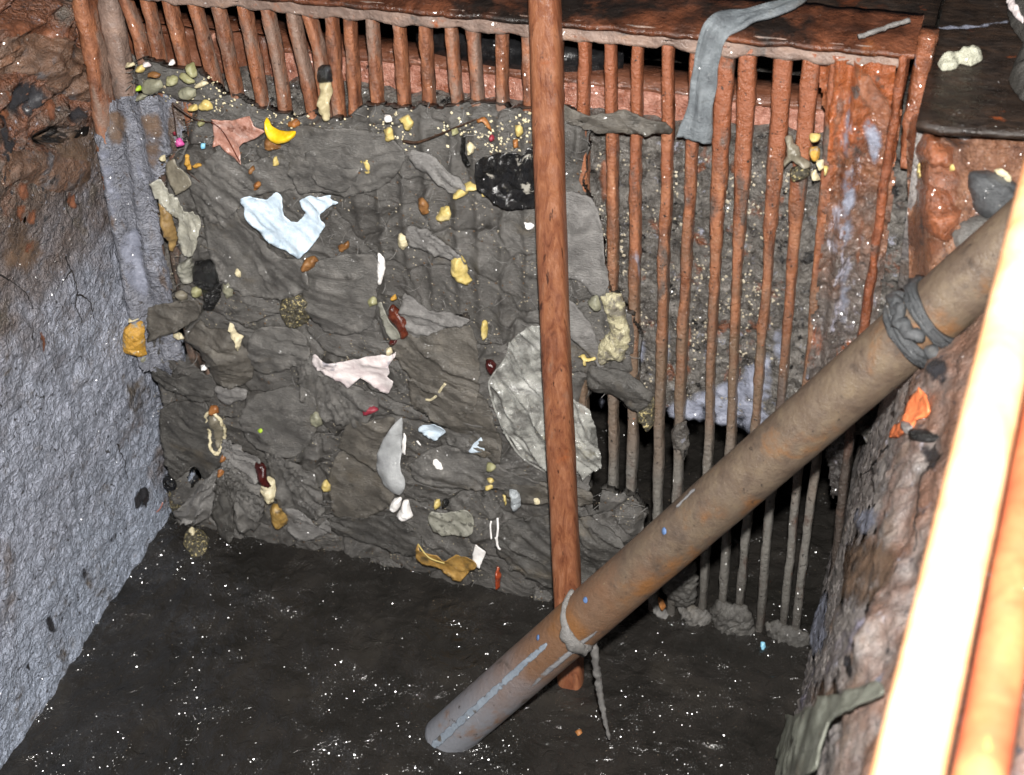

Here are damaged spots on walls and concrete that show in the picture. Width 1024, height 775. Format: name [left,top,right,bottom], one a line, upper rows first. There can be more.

rust [805,59,902,380]
rust [825,431,855,498]